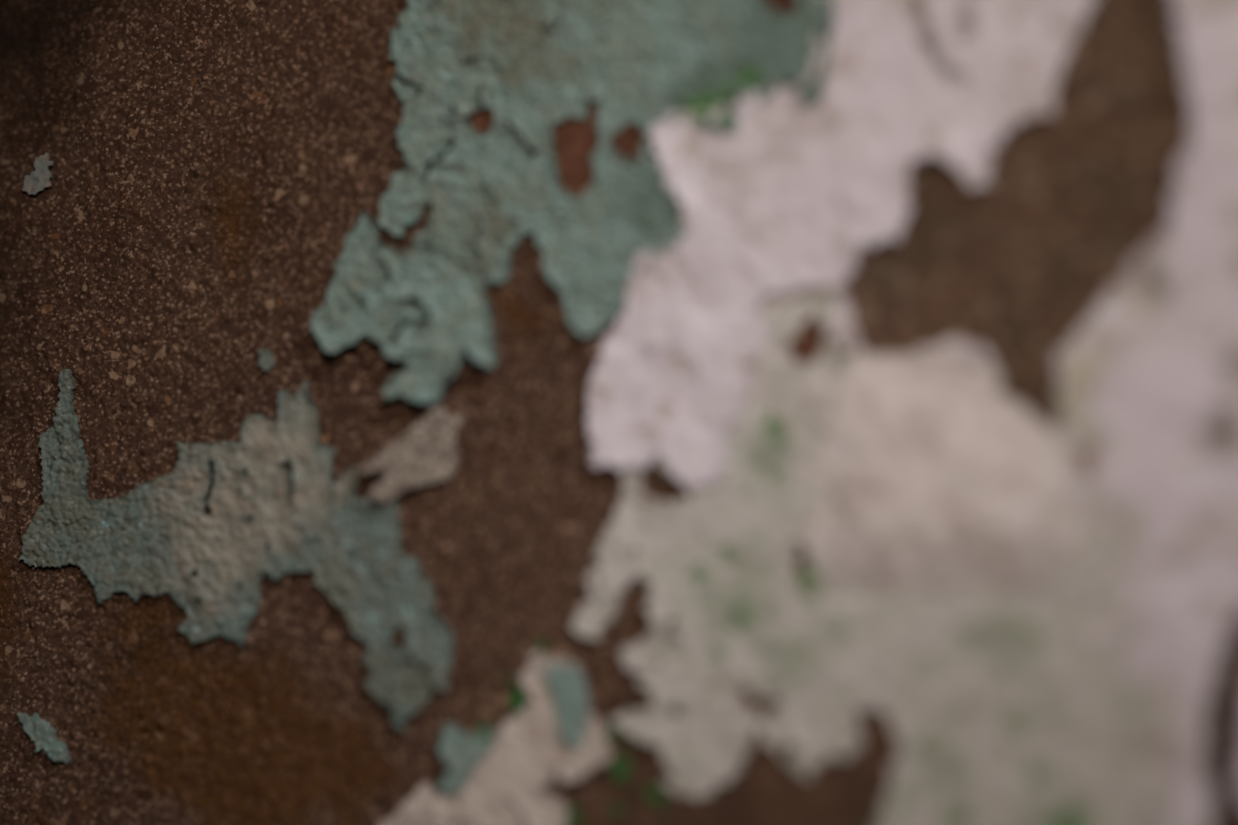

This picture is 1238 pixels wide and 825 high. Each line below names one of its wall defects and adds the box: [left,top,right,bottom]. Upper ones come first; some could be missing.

peeling [19,369,464,731]
peeling [309,0,1238,825]
peeling [17,711,71,764]